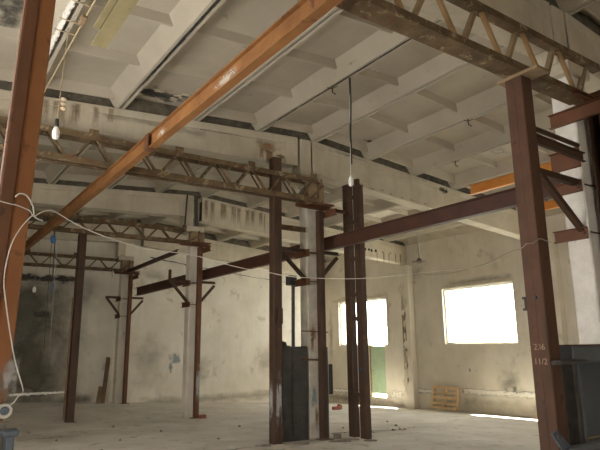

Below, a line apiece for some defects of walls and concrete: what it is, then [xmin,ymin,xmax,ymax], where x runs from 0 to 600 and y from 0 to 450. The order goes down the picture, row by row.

damp [7,283,67,403]
peeling [391,270,410,400]